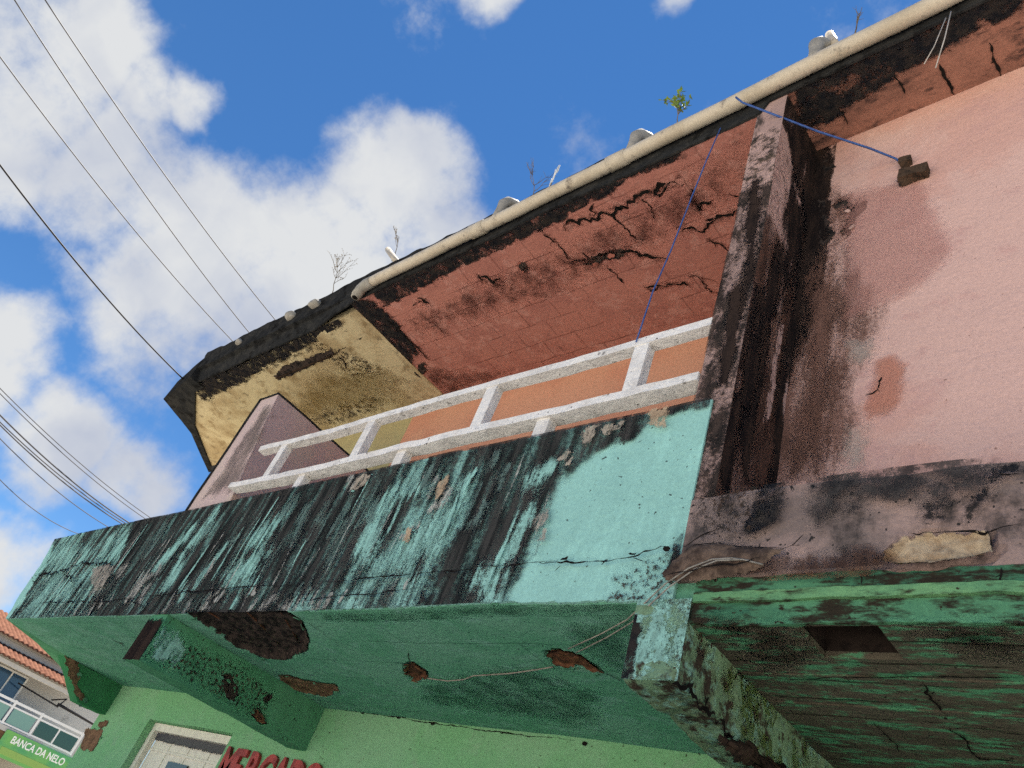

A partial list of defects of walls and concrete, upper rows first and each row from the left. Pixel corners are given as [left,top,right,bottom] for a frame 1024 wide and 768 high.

crack [939,64,954,95]
crack [989,43,1001,76]
damp [351,152,702,365]
crack [542,181,739,293]
damp [656,0,1024,536]
damp [197,319,379,401]
damp [8,406,651,660]
crack [30,524,723,639]
damp [607,534,683,601]
flaking render [881,530,993,564]
spalling [187,610,309,662]
crack [792,676,1022,762]